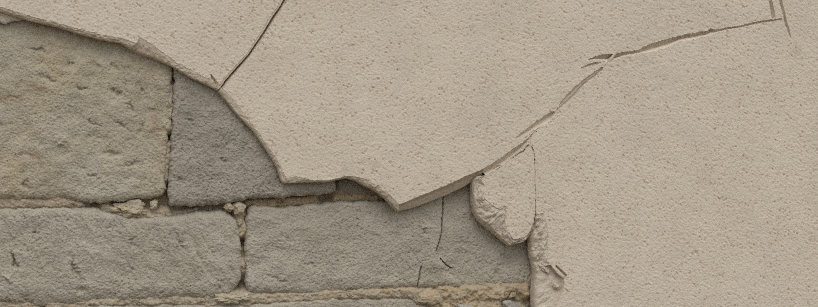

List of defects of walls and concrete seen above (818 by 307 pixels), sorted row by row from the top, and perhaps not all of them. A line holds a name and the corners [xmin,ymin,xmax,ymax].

crack [210,0,288,89]
spalling [0,7,569,307]
crack [483,0,790,175]